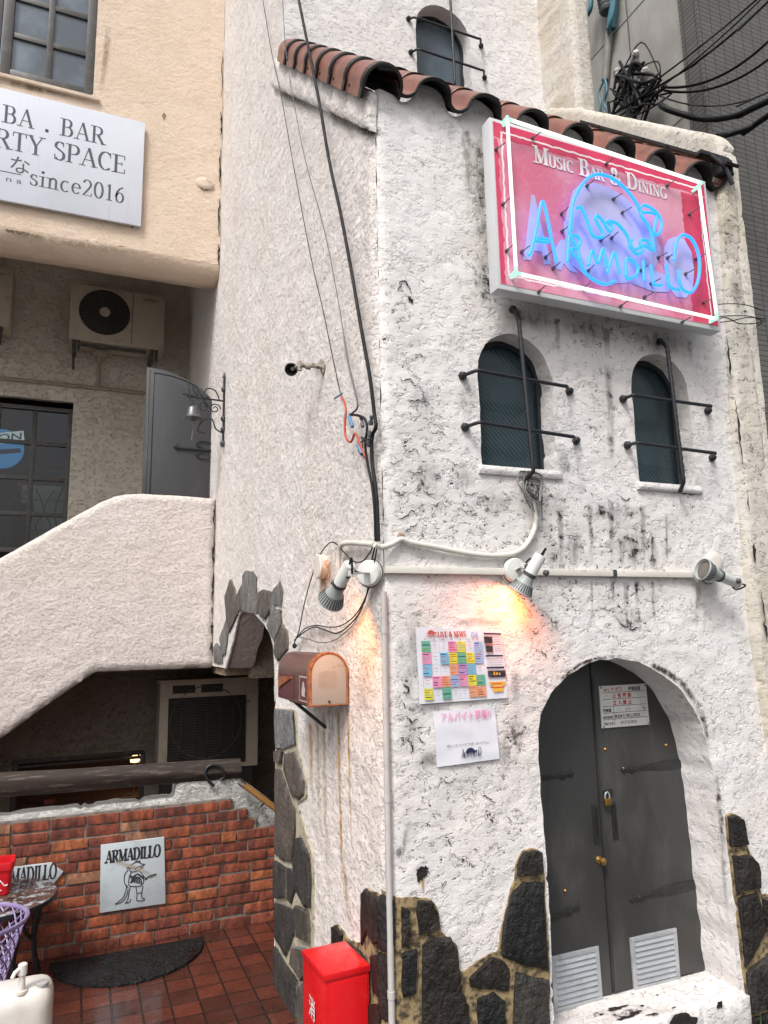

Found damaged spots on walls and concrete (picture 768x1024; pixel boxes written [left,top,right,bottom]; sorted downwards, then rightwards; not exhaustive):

water stain [588,506,668,561]
rust [309,714,350,848]